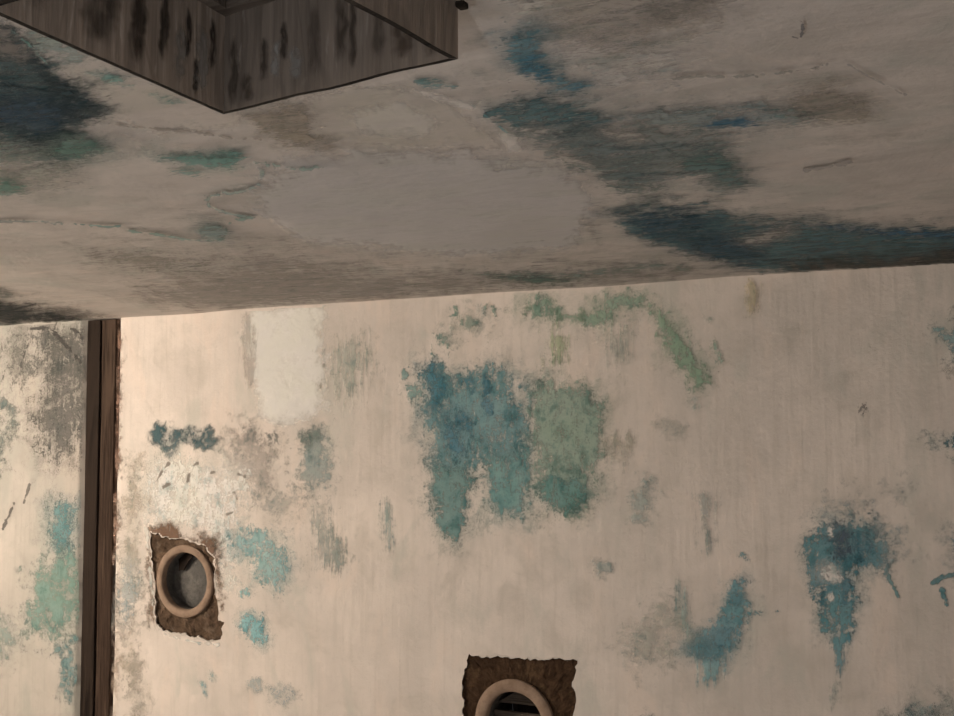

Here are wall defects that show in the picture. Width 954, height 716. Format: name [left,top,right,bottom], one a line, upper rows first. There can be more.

leakage [0,27,115,196]
crack [0,169,265,241]
leakage [113,22,954,398]
leakage [0,501,79,704]
leakage [0,290,92,470]
leakage [149,421,219,460]
peeling [143,453,253,647]
leakage [230,423,333,511]
leakage [401,305,632,541]
flaking render [460,653,577,716]
leakage [622,579,762,686]
leakage [803,504,900,674]